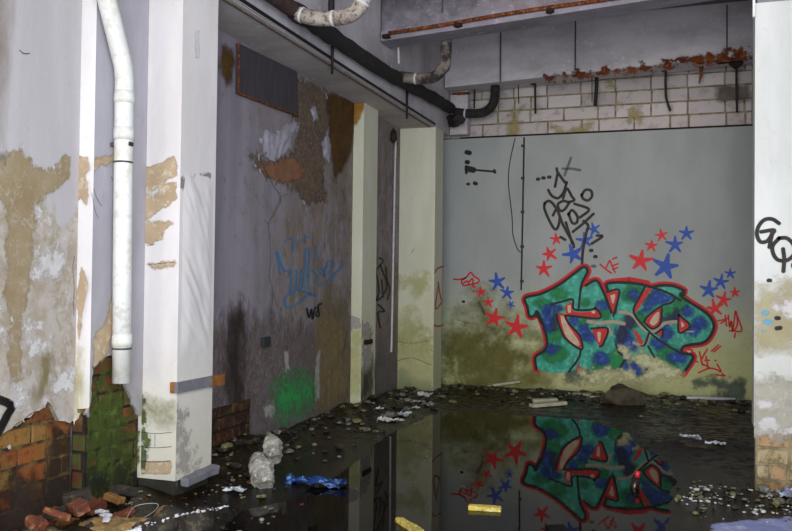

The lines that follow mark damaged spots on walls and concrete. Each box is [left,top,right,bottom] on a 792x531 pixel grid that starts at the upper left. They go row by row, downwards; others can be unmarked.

rust [543,46,753,84]
peeling [249,77,331,207]
peeling [145,156,211,245]
peeling [0,146,114,388]
peeling [148,261,176,269]
spalling [0,299,201,527]
water stain [693,376,746,399]